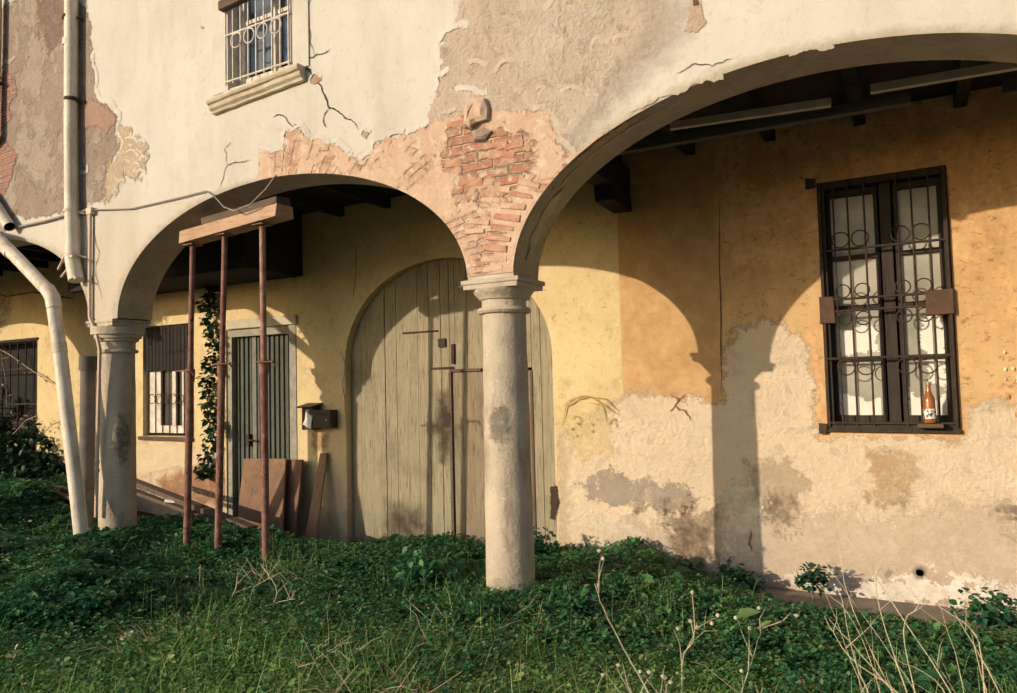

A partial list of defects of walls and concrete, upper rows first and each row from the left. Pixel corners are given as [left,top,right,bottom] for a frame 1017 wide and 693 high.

peeling [0,0,64,233]
peeling [78,0,149,211]
crack [305,29,357,127]
flaking render [257,0,724,277]
spalling [788,42,834,57]
leakage [435,398,450,463]
leakage [490,406,510,442]
peeling [550,315,1017,611]
leakage [570,418,1017,615]